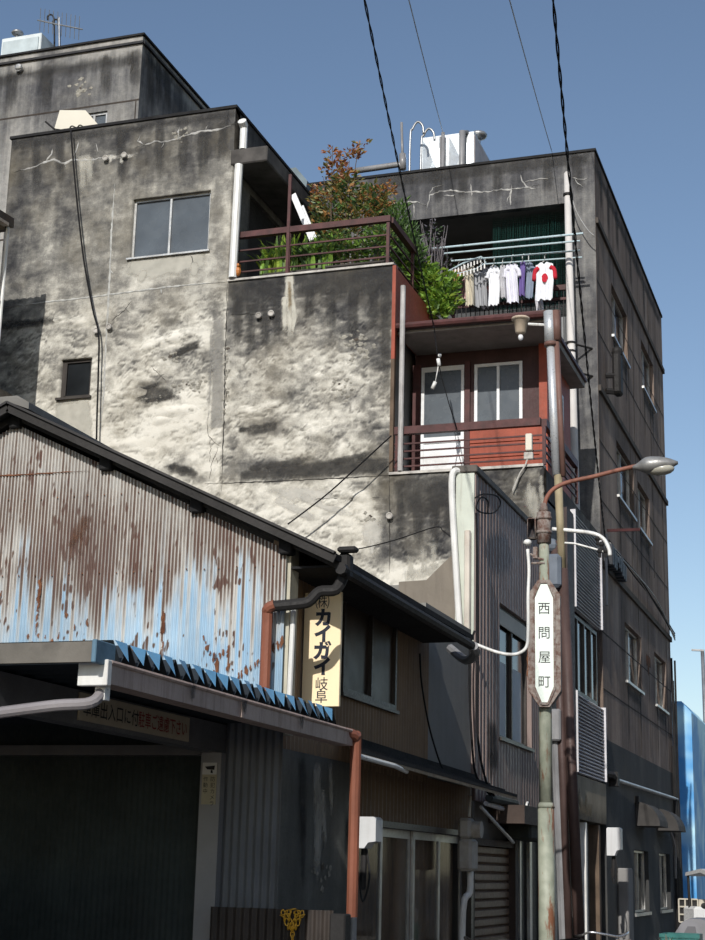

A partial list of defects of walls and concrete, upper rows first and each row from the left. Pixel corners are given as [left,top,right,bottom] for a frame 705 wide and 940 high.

leakage [0,52,169,99]
crack [136,123,235,148]
crack [396,177,548,216]
leakage [233,271,390,361]
crack [6,142,391,573]
leakage [239,422,276,435]
corrosion [27,578,60,641]
leakage [300,763,332,869]